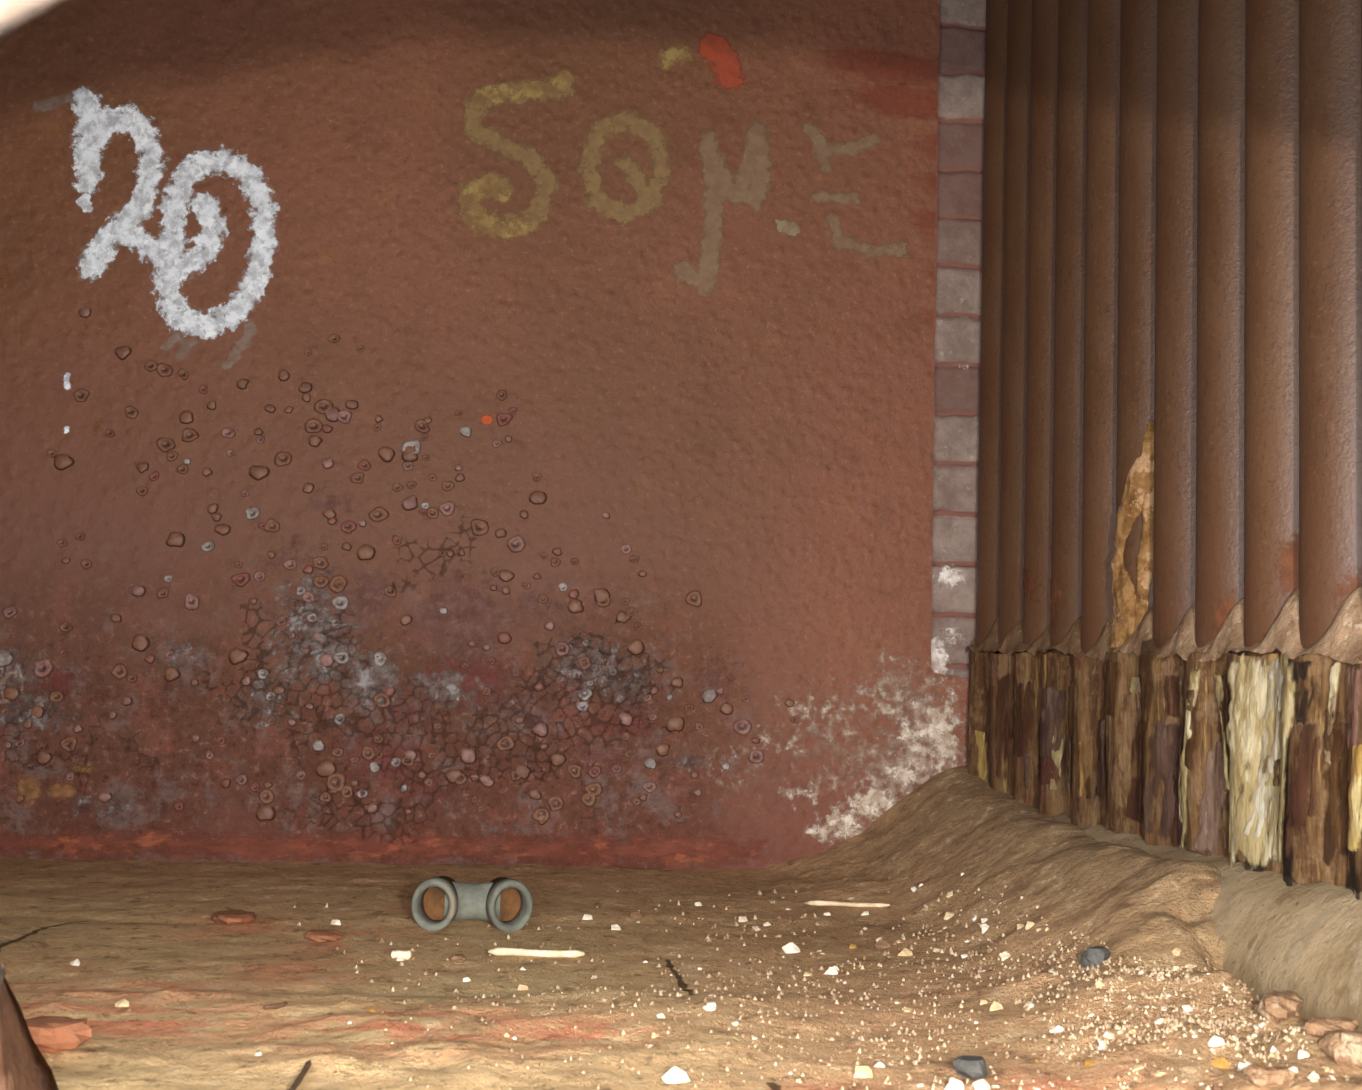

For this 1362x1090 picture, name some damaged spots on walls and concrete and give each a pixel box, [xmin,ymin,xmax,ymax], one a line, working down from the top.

damp [766,628,965,843]